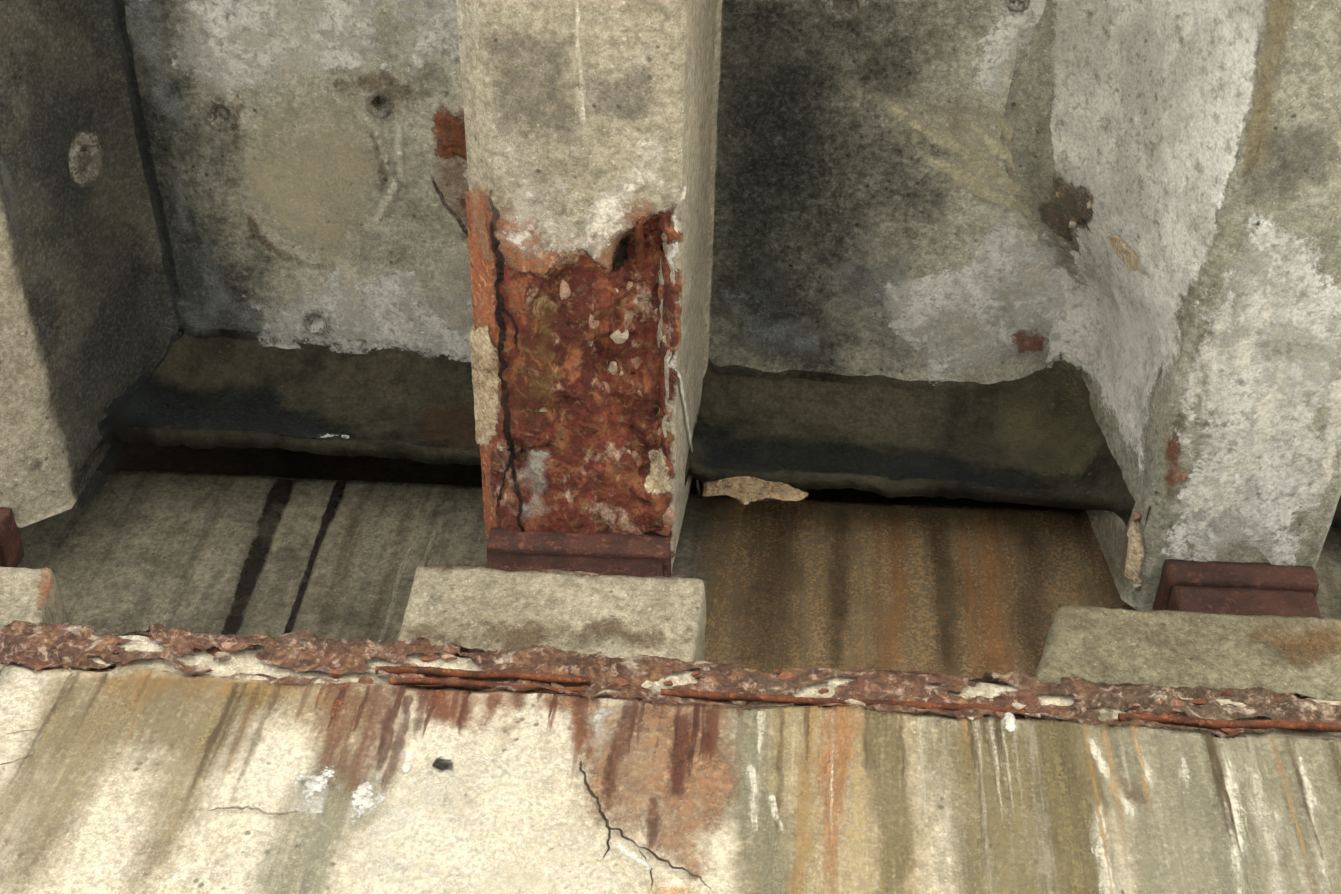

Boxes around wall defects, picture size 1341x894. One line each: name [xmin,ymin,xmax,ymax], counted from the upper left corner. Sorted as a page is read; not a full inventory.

water stain [575,0,586,122]
crack [431,178,525,532]
water stain [530,450,550,469]
corrosion [431,105,653,540]
spalling [470,206,683,559]
water stain [504,138,686,268]
spalling [703,476,809,505]
water stain [709,0,1341,565]
corrosion [295,682,742,894]
crack [579,761,711,889]
water stain [733,705,917,894]
water stain [931,716,1341,894]